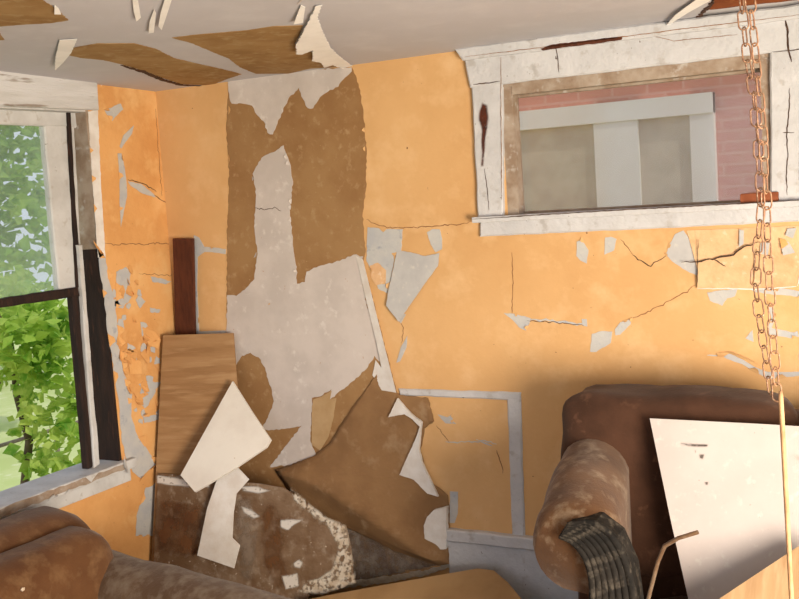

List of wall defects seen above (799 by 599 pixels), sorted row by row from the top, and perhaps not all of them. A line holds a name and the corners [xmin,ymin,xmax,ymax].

peeling [132,0,172,33]
peeling [55,39,77,70]
flaking render [228,67,352,134]
corrosion [479,104,488,165]
peeling [0,104,161,537]
flaking render [194,145,469,467]
peeling [576,236,589,263]
peeling [590,226,799,352]
crack [684,242,758,284]
peeling [708,352,799,379]